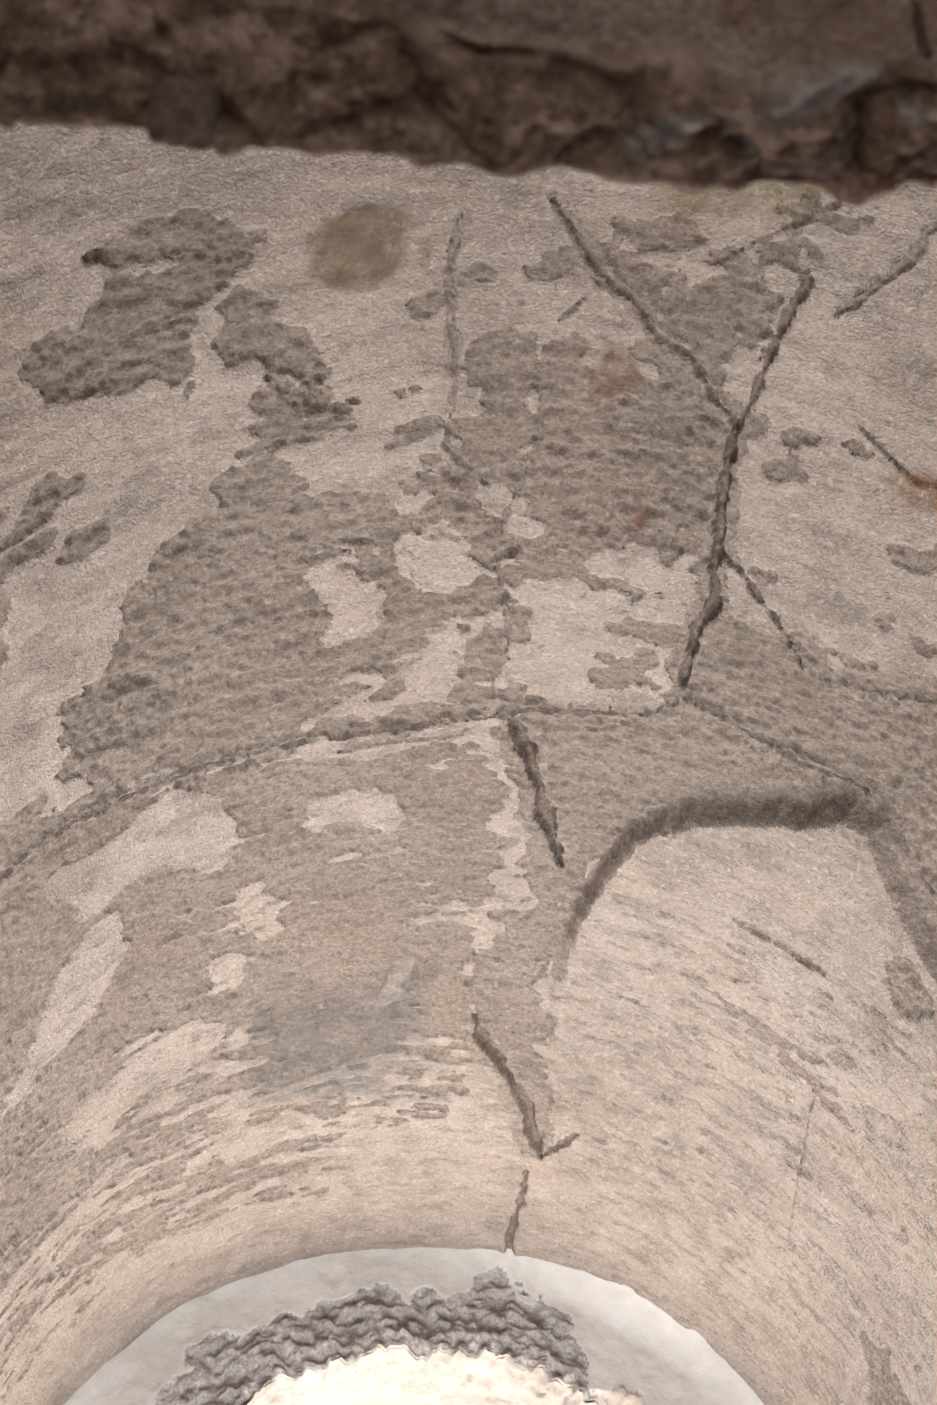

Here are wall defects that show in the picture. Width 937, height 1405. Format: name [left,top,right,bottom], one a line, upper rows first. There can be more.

crack [911,0,934,60]
damp [319,208,403,287]
spalling [0,0,937,799]
crack [0,196,937,900]
peeling [0,615,937,1405]
crack [461,1009,579,1254]
crack [732,918,828,979]